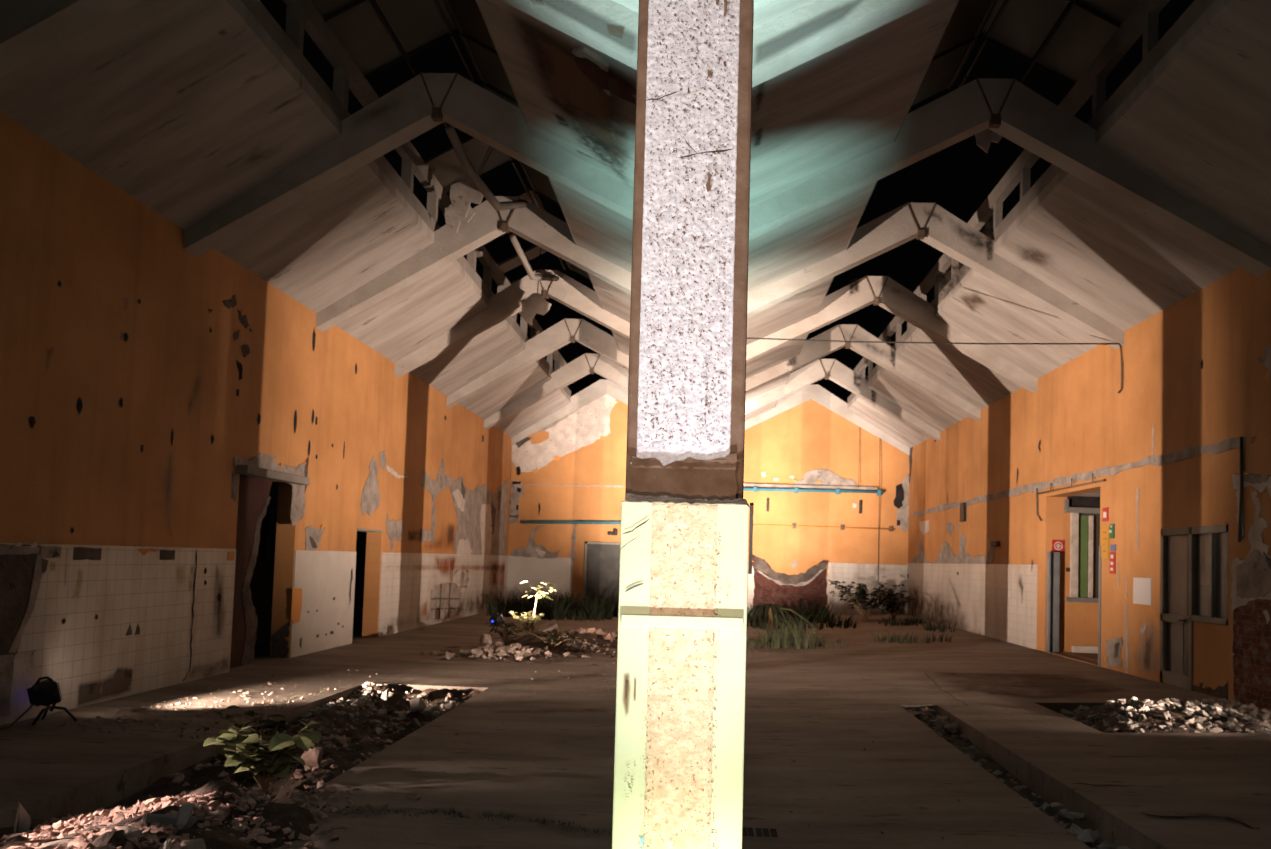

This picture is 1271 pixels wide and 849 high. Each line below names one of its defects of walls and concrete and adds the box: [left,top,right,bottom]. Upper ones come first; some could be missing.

peeling [757,2,858,61]
peeling [521,0,835,615]
flaking render [231,440,325,551]
flaking render [293,409,317,434]
flaking render [360,394,620,561]
flaking render [761,469,857,487]
peeling [0,527,102,660]
flaking render [1192,473,1271,712]